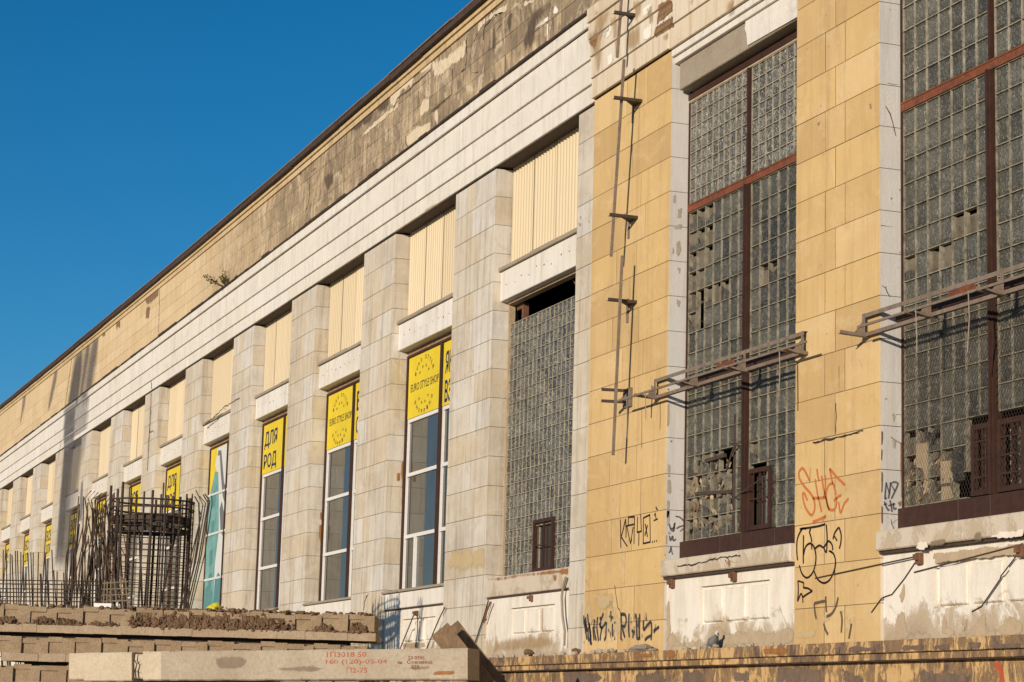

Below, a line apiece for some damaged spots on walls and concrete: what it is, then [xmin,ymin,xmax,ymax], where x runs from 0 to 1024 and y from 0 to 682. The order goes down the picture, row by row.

peeling [478,5,507,31]
spalling [643,0,673,39]
peeling [363,41,466,135]
damp [354,99,388,130]
peeling [406,98,439,146]
flaking render [916,529,1024,563]
flaking render [666,601,794,648]
flaking render [894,584,1022,651]